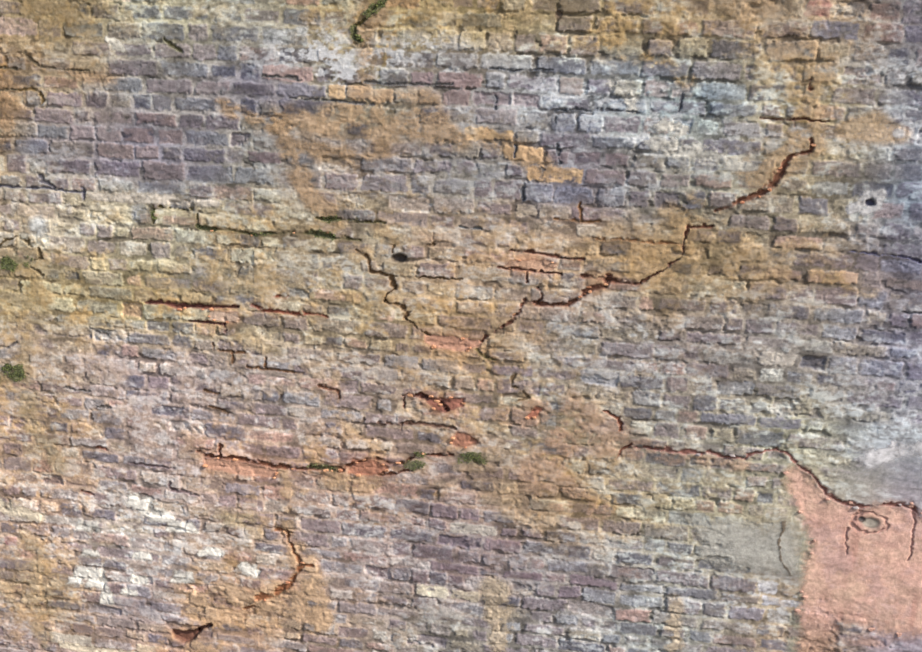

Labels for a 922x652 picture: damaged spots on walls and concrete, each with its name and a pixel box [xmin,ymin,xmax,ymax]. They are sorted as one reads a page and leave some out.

crack [351,13,373,42]
crack [475,117,824,360]
crack [152,205,463,335]
crack [145,295,328,373]
crack [203,389,229,414]
crack [317,384,340,399]
crack [377,392,457,430]
crack [510,374,530,401]
crack [197,443,454,476]
crack [243,527,314,610]
spalling [783,467,922,652]